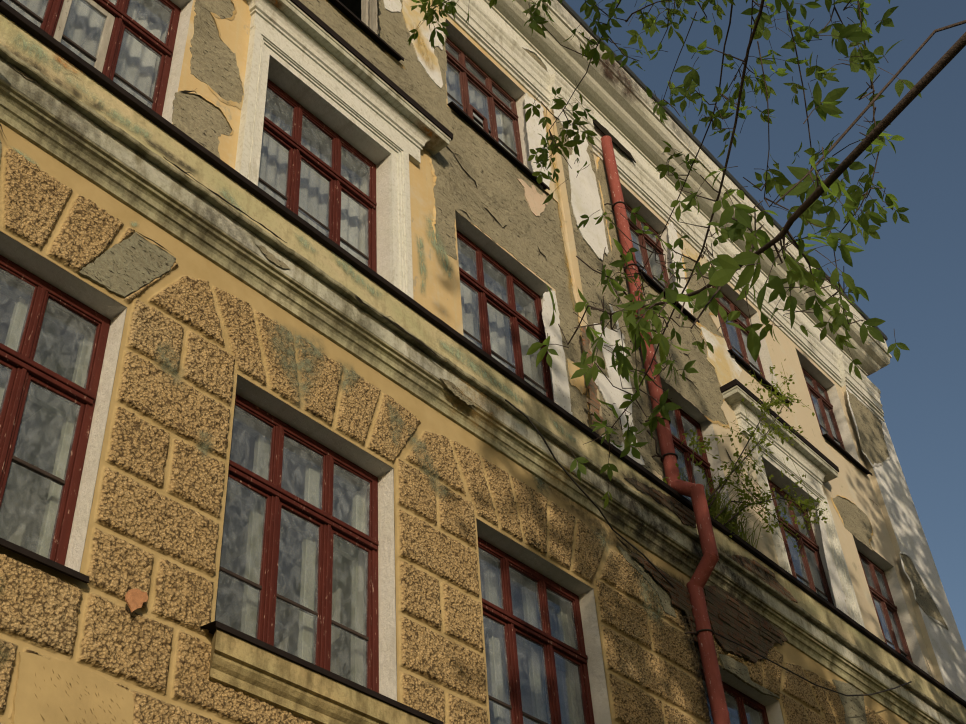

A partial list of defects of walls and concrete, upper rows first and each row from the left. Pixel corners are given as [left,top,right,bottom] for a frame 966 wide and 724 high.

flaking render [172,0,244,158]
leakage [108,111,194,171]
flaking render [299,0,666,478]
flaking render [639,222,742,429]
flaking render [846,389,890,467]
flaking render [624,478,697,528]
flaking render [125,588,148,612]
flaking render [631,551,698,643]
flaking render [703,585,788,663]